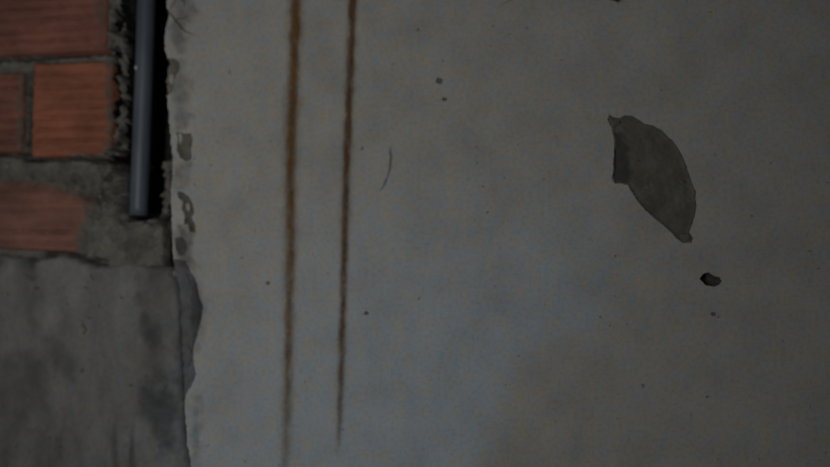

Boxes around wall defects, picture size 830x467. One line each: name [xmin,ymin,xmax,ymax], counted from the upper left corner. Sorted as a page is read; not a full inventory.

flaking render [0,0,203,401]
corrosion [287,2,299,233]
corrosion [342,0,355,282]
peeling [607,115,696,243]